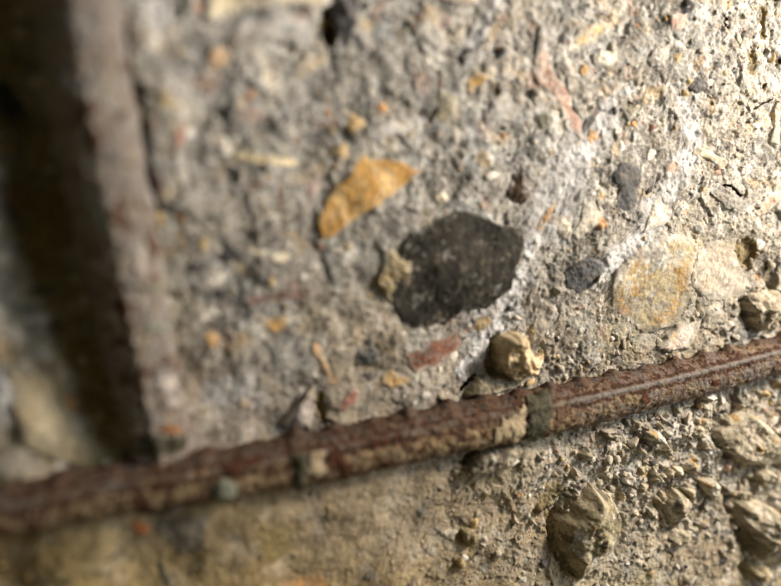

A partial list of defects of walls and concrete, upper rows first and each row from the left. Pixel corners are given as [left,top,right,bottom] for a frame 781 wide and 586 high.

crack [125,16,159,211]
peeling [464,371,524,398]
spalling [315,389,328,423]
corrosion [329,445,357,480]